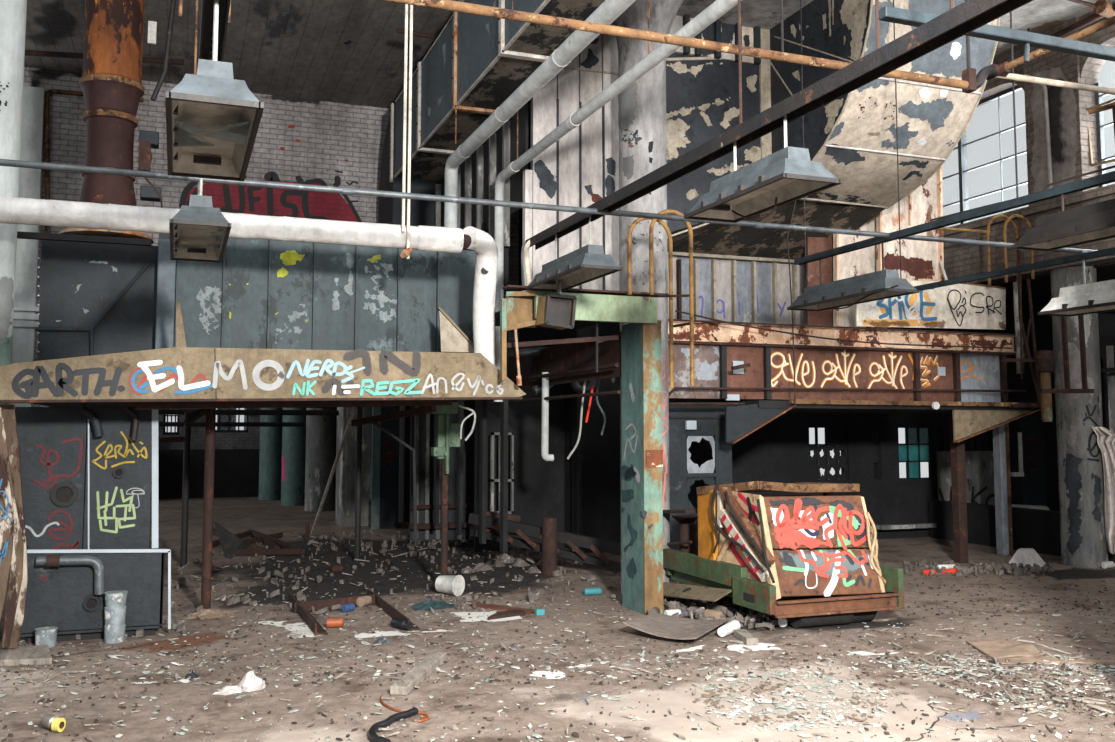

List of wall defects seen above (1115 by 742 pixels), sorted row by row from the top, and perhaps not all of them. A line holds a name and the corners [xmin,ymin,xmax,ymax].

peeling [667,22,750,77]
peeling [790,0,965,61]
peeling [910,35,995,78]
peeling [825,98,866,165]
peeling [882,98,954,181]
peeling [534,160,557,199]
peeling [584,157,616,196]
corrosion [668,331,719,347]
corrosion [864,320,909,347]
corrosion [923,320,945,349]
corrosion [970,322,1012,351]
peeling [620,464,653,579]